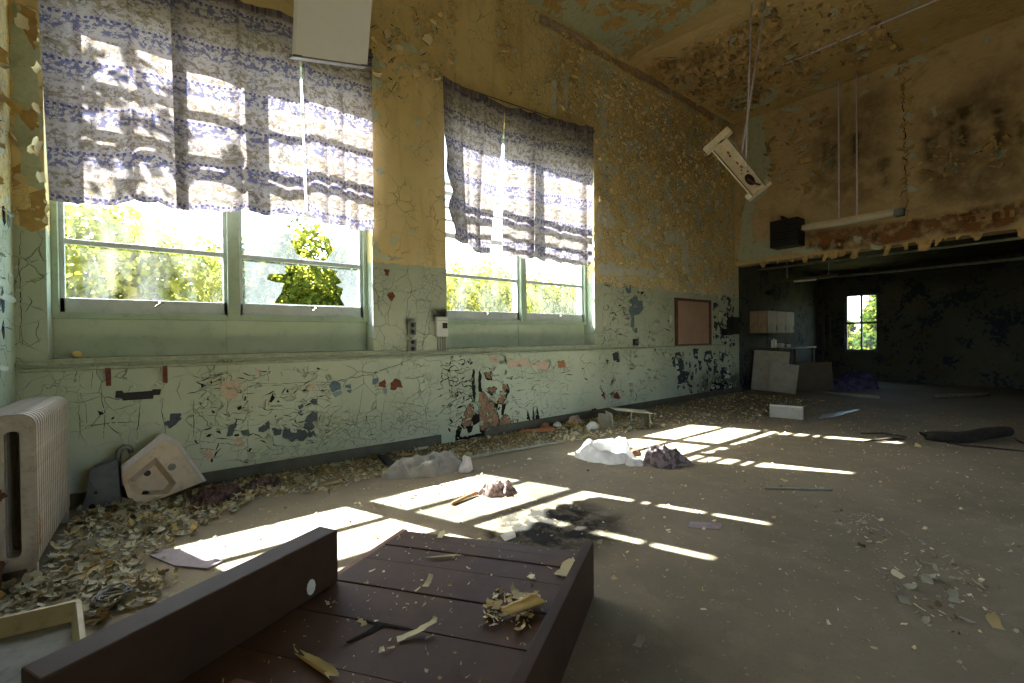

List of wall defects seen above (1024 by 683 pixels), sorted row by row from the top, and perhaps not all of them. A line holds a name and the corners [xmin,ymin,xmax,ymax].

peeling [371,0,455,105]
peeling [0,3,51,233]
peeling [551,0,984,268]
crack [863,0,914,226]
peeling [0,271,17,339]
peeling [164,413,182,429]
peeling [195,367,352,452]
crack [70,264,673,466]
peeling [372,378,403,394]
flaking render [445,352,566,441]
peeling [589,262,737,411]